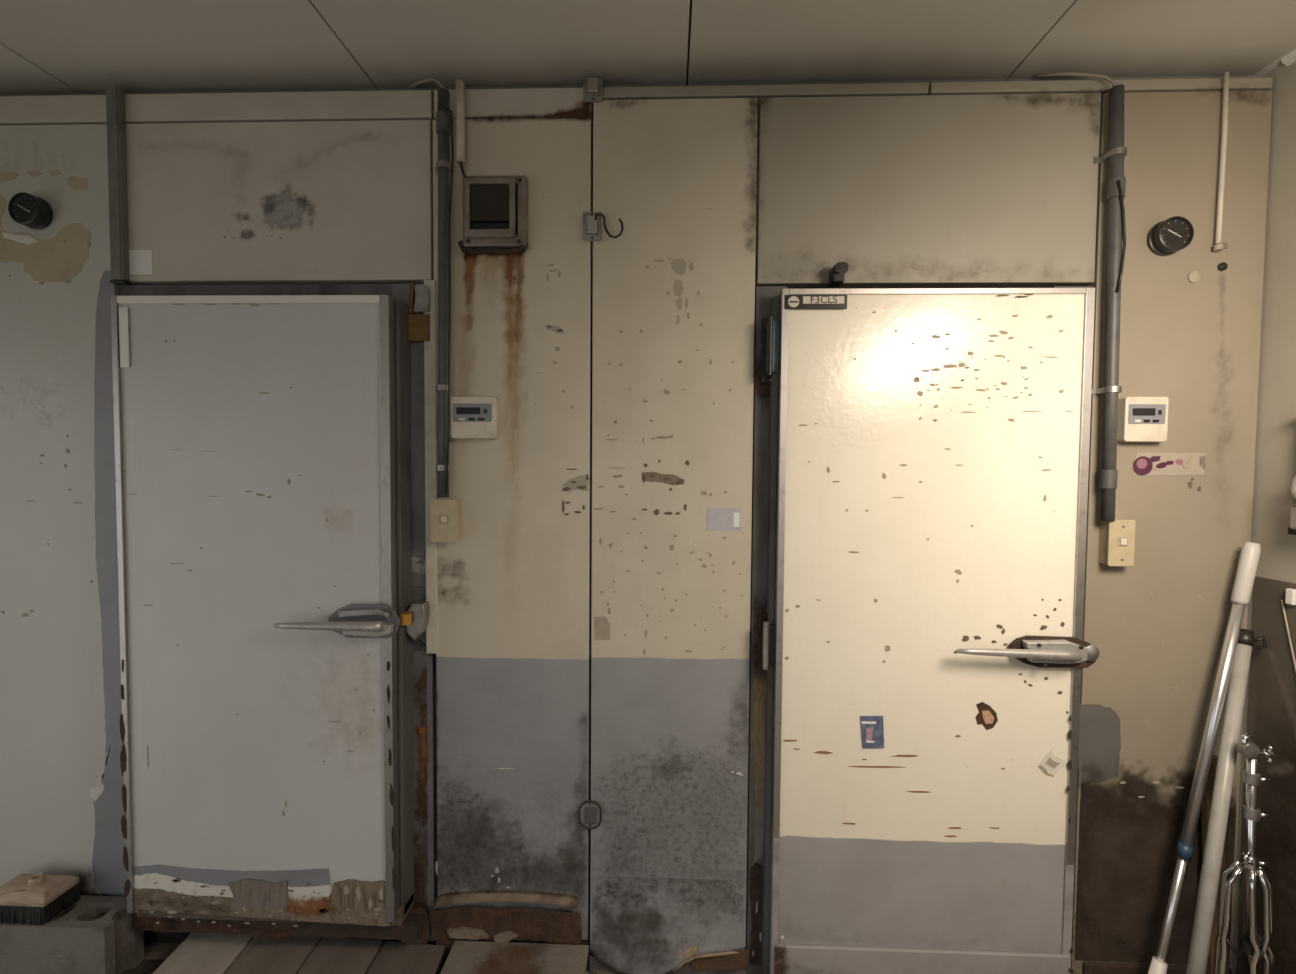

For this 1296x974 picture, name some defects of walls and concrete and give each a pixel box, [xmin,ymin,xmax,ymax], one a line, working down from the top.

rust [474,102,590,121]
peeling [0,169,91,285]
mould [223,186,313,239]
rust [458,241,528,318]
rust [120,659,131,896]
rust [401,669,582,945]
rust [749,600,767,966]
rust [975,702,998,730]
damp [1075,772,1202,964]
damp [1225,805,1236,966]
damp [1256,730,1296,974]